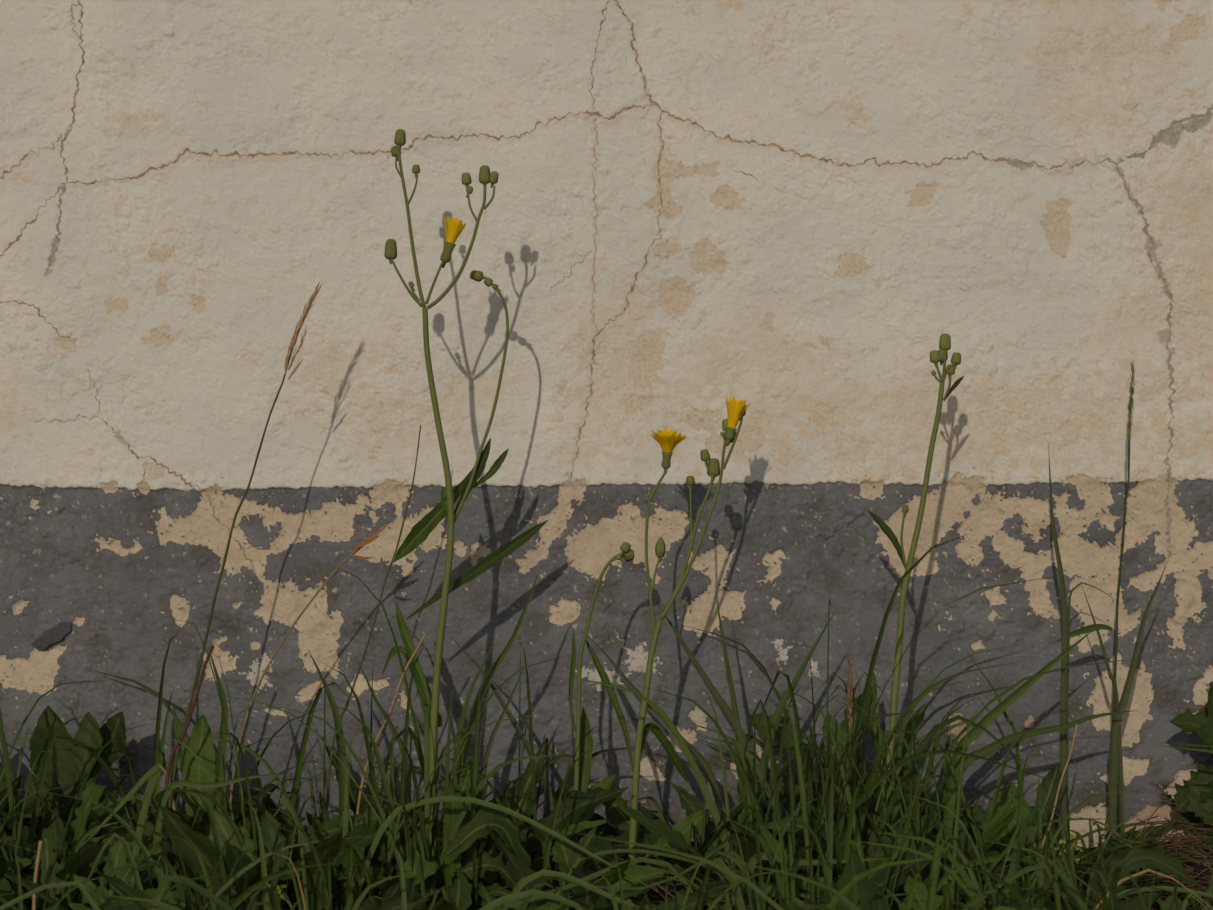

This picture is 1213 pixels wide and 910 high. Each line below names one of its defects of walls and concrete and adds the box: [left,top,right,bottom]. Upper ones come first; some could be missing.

crack [0,0,1213,574]
peeling [3,590,30,620]
peeling [0,617,85,704]
peeling [254,705,288,724]
peeling [91,471,491,716]
peeling [509,470,789,644]
peeling [851,467,1213,786]
peeling [1058,759,1196,860]